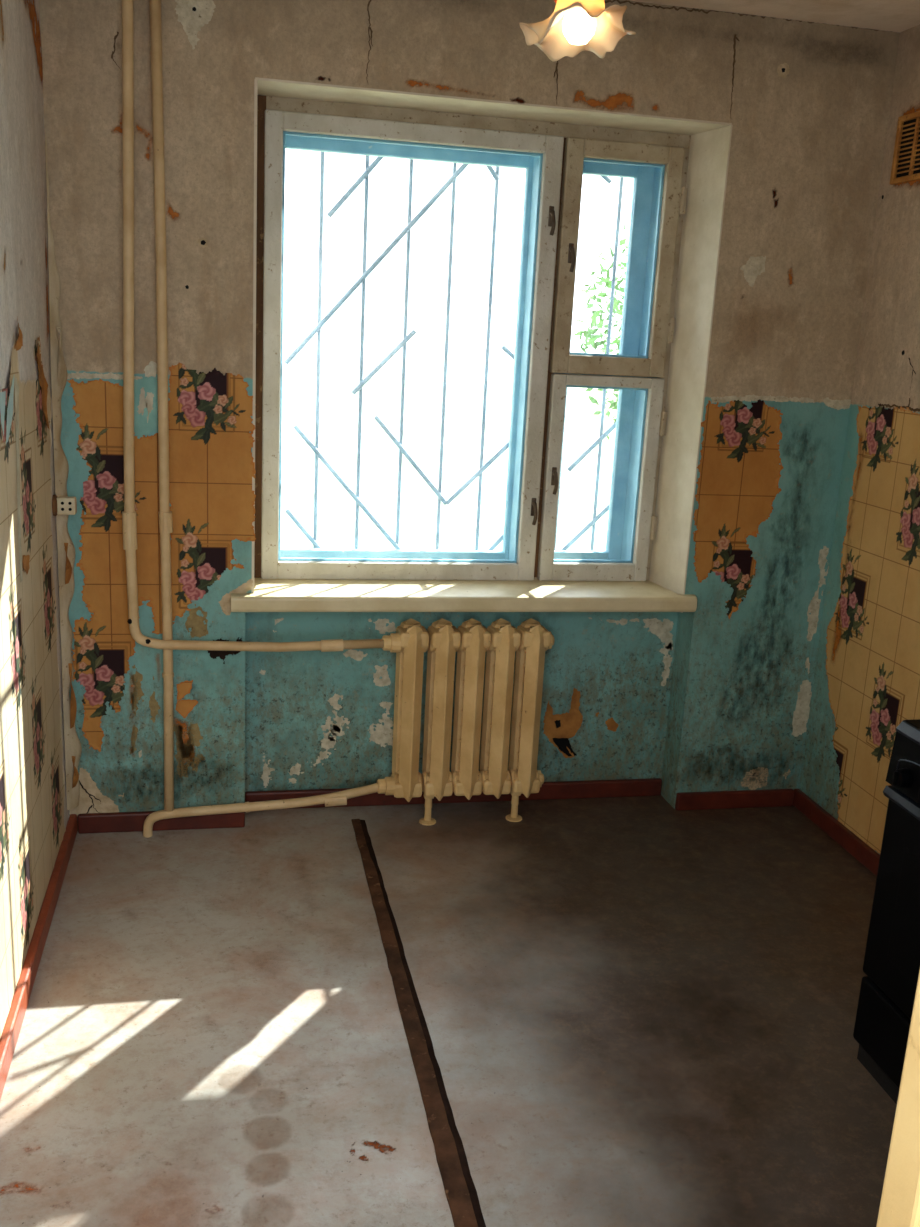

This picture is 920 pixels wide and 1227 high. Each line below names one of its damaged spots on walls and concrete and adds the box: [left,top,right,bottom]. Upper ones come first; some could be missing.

crack [111,32,121,70]
crack [365,0,373,82]
crack [604,0,892,117]
peeling [56,326,158,439]
peeling [64,543,72,584]
peeling [185,579,256,664]
peeling [68,663,77,729]
peeling [129,665,160,758]
peeling [174,699,206,778]
peeling [343,649,394,747]
peeling [553,720,577,756]
flaking render [69,756,124,817]